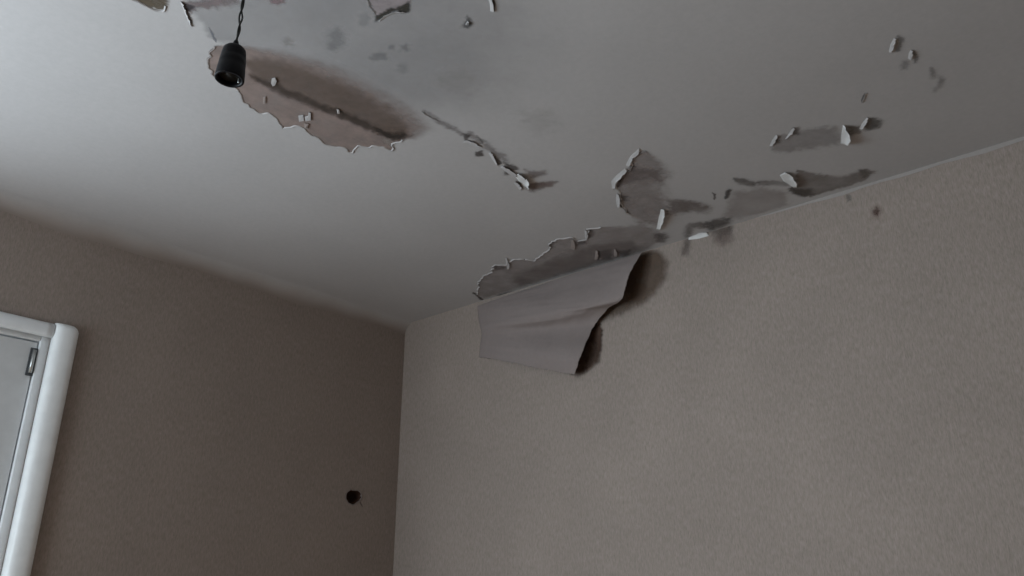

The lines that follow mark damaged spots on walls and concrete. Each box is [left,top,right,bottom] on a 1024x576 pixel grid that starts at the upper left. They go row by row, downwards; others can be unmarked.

peeling [180,0,234,27]
peeling [368,0,410,22]
peeling [207,28,224,77]
peeling [235,47,438,154]
peeling [841,118,880,146]
peeling [464,134,551,190]
peeling [611,148,665,239]
peeling [780,170,871,196]
peeling [473,227,601,300]